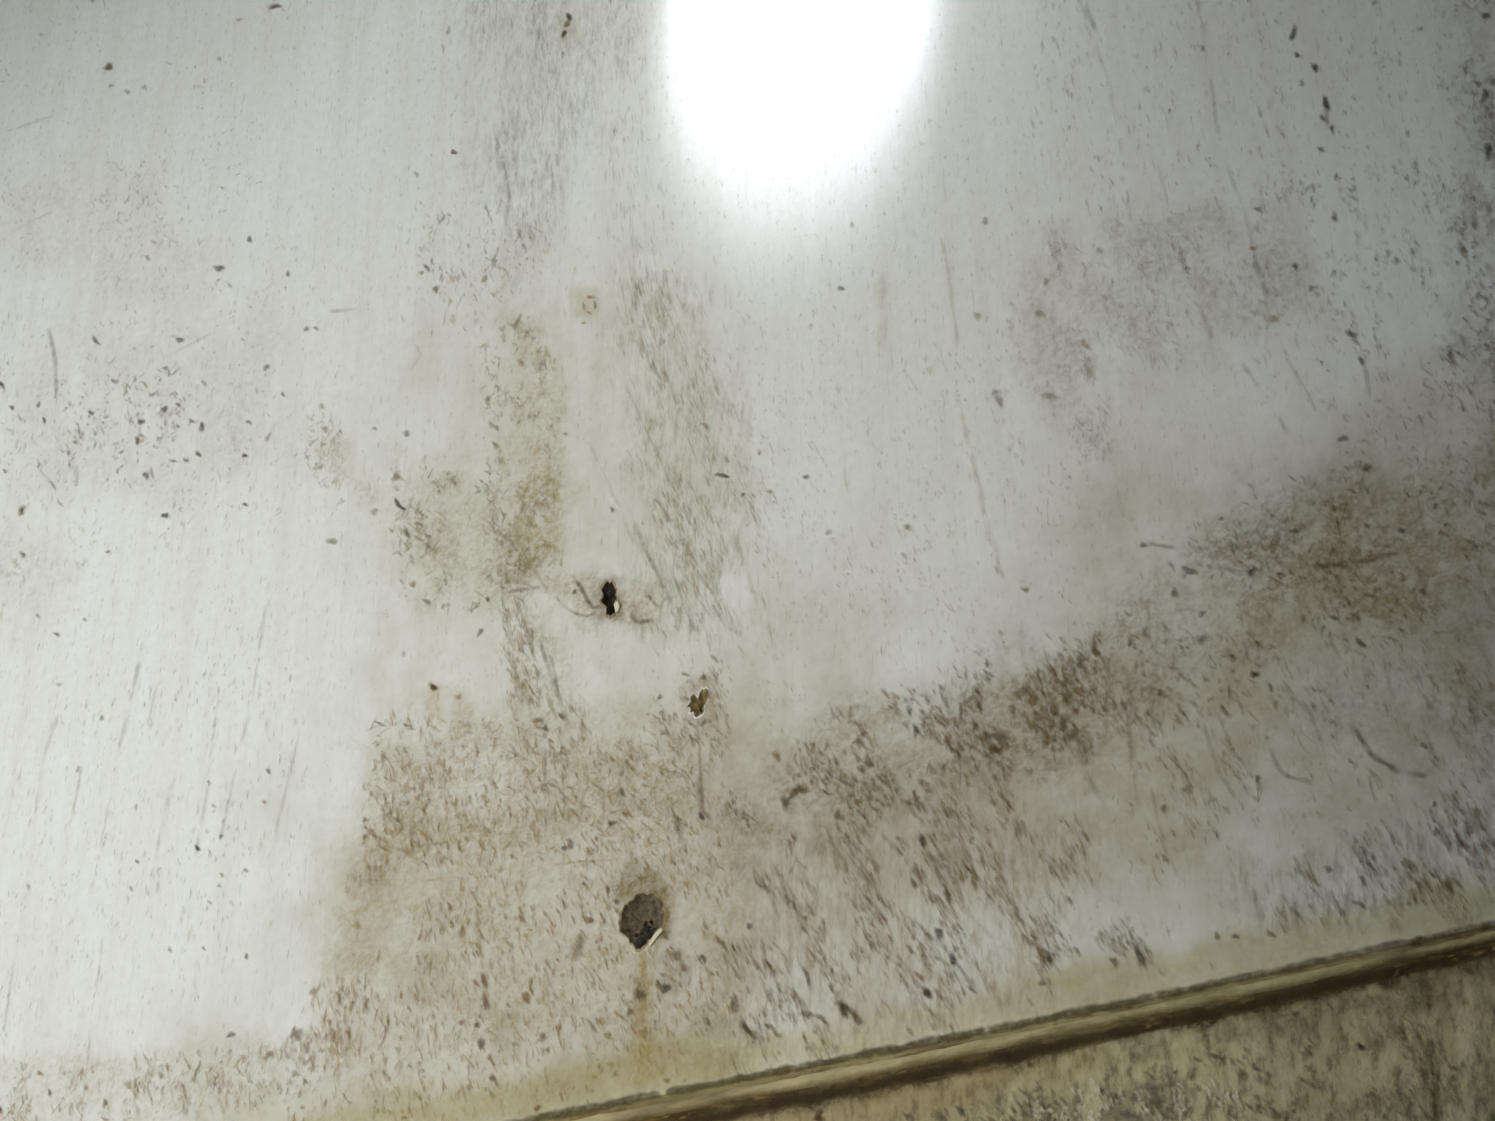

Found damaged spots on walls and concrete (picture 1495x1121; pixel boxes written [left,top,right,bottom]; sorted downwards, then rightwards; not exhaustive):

spalling [619,893,665,949]
water stain [1365,924,1488,953]
water stain [516,954,1342,1121]